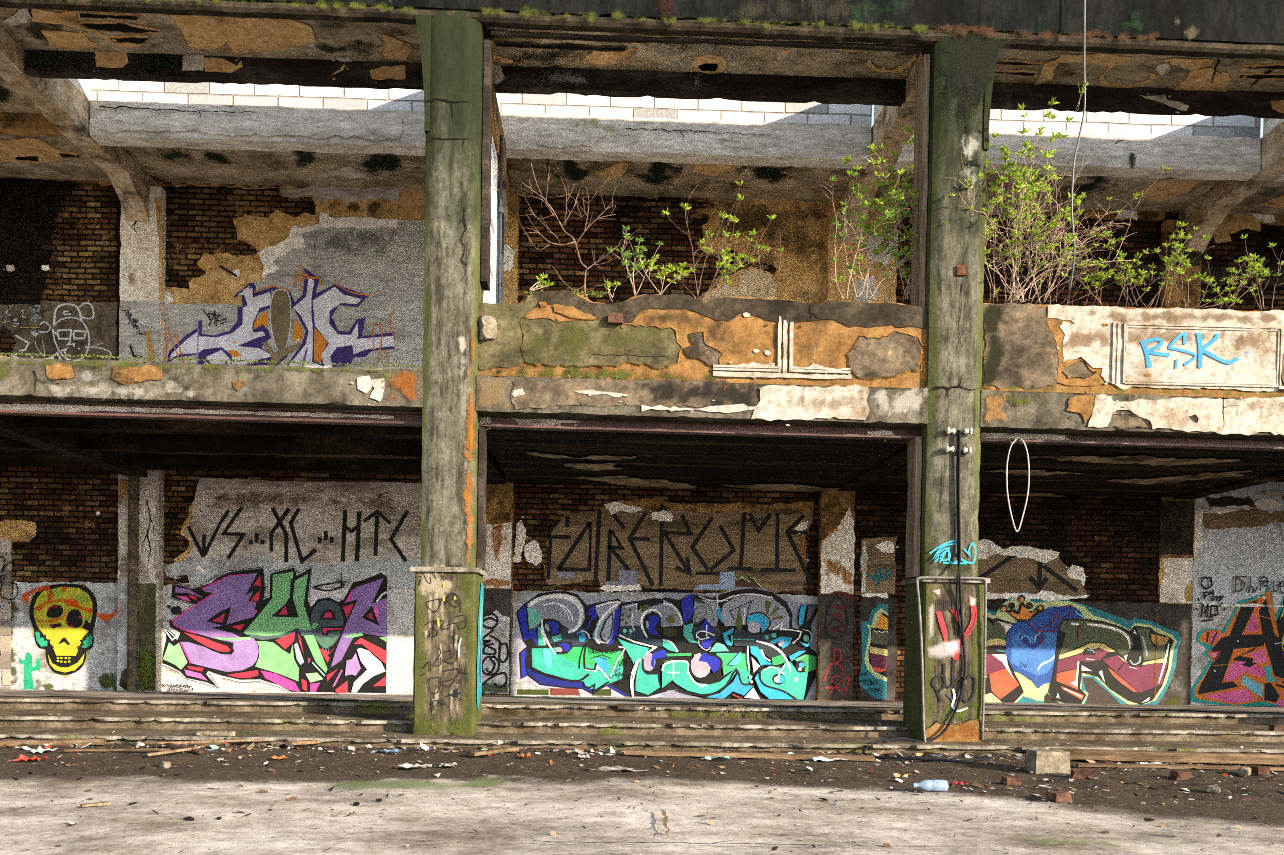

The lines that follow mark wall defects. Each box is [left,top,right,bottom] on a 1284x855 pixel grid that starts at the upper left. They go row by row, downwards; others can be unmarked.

peeling [3,8,316,73]
peeling [370,34,412,83]
leakage [956,79,985,181]
flaking render [155,166,402,305]
flaking render [498,162,926,435]
flaking render [1263,291,1284,311]
spalling [983,302,1284,435]
peeling [0,520,37,542]
rust [463,394,503,562]
flaking render [513,452,840,597]
flaking render [978,432,1284,603]
efflorescence [421,566,452,636]